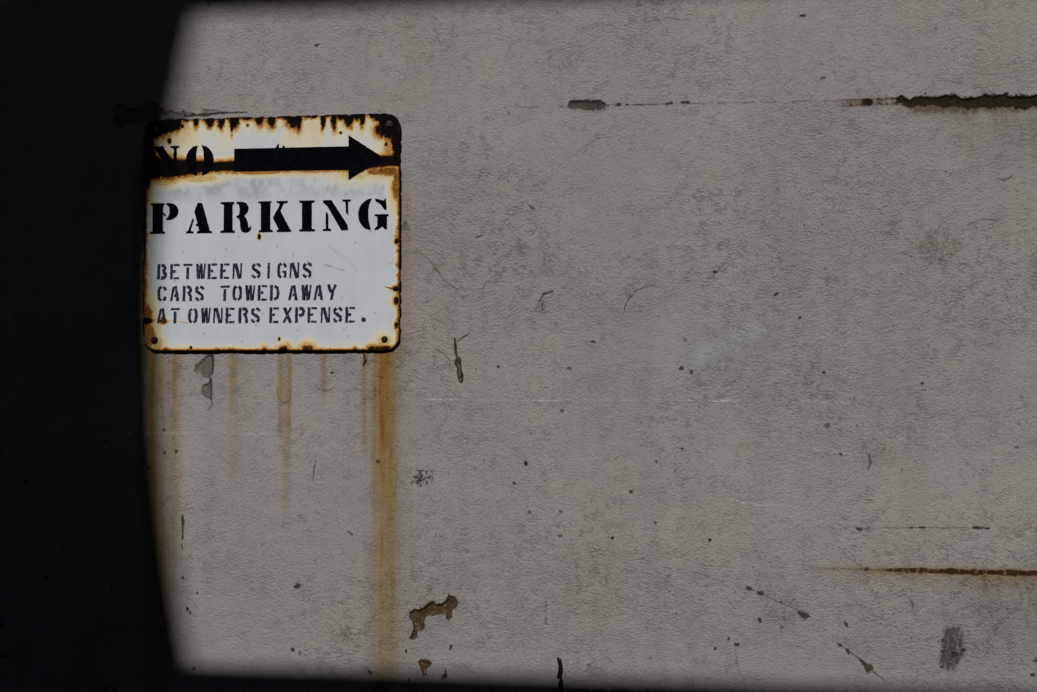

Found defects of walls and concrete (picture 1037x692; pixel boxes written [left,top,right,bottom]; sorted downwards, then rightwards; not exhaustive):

crack [616,99,689,107]
rust [362,349,394,631]
spalling [405,594,458,653]